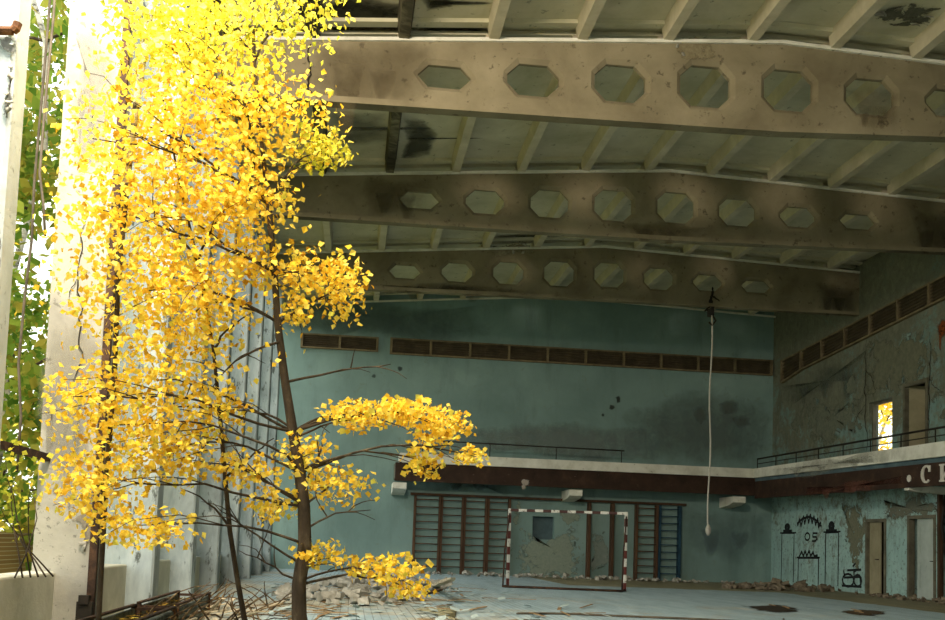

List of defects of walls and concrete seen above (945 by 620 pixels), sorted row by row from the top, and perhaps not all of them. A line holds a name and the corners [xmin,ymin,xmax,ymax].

leakage [341,116,388,140]
leakage [400,122,457,158]
peeling [842,504,866,569]